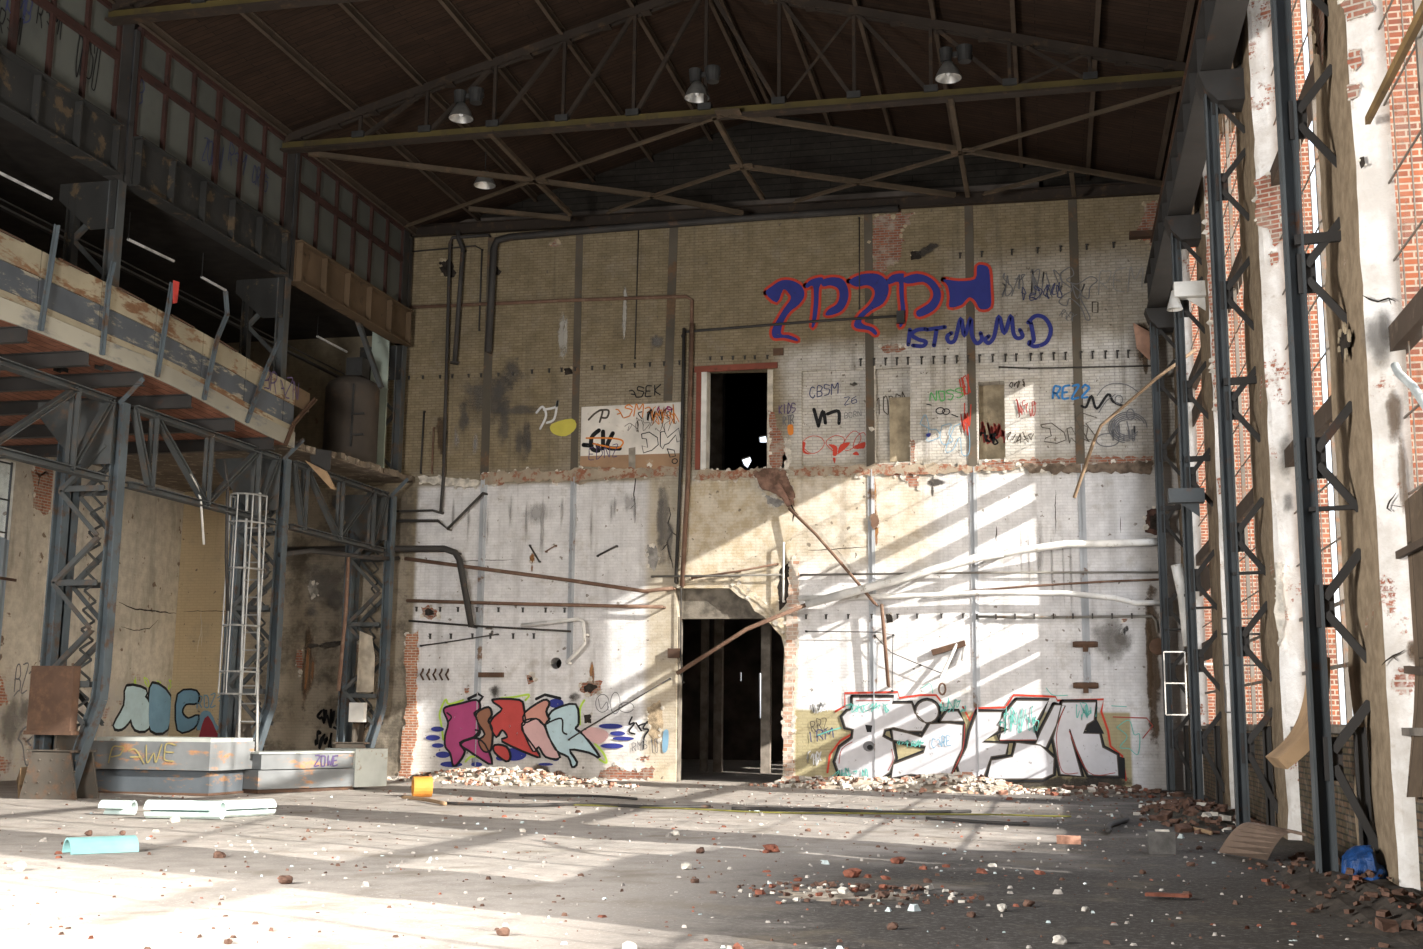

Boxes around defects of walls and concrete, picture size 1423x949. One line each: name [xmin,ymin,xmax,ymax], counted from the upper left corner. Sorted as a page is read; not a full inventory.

spalling [1311,0,1374,65]
spalling [1251,171,1283,266]
spalling [30,465,53,516]
spalling [398,605,441,776]